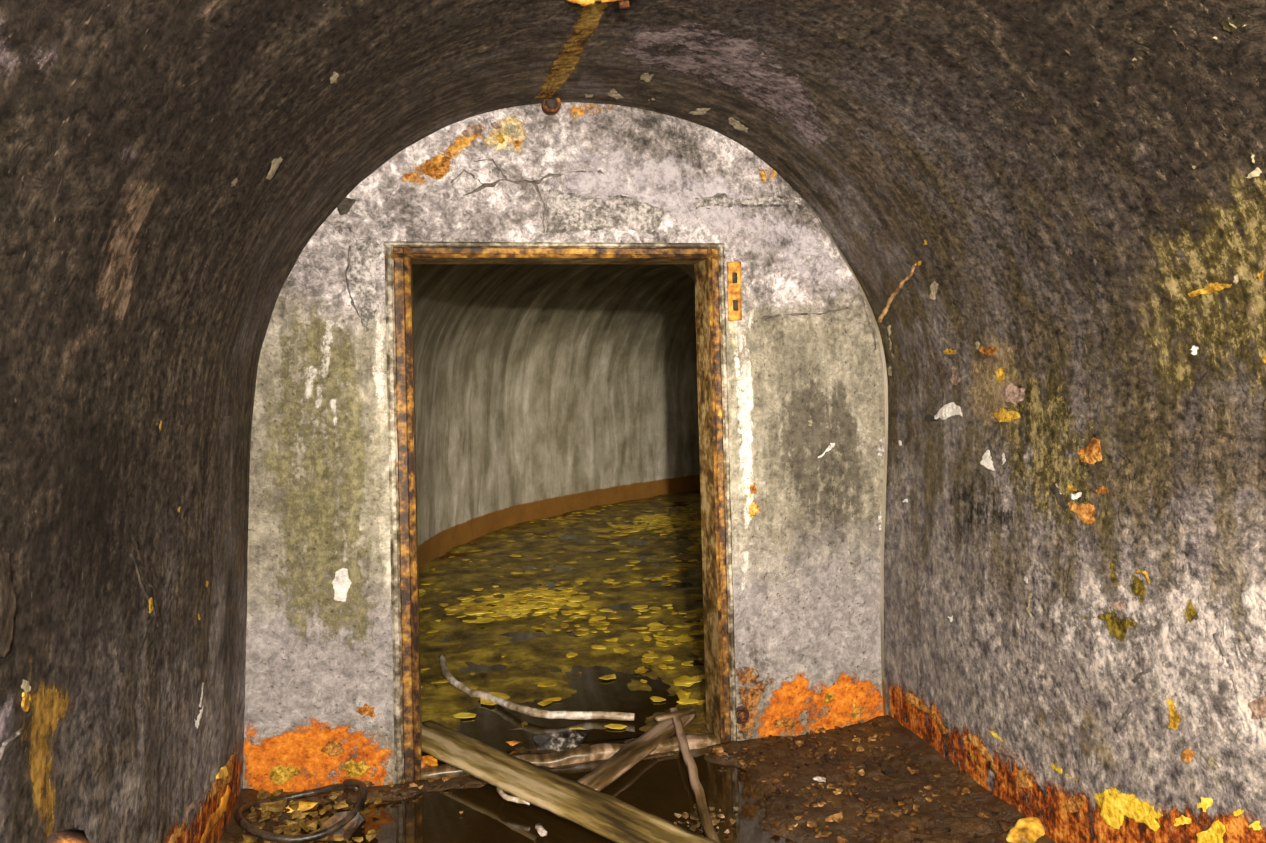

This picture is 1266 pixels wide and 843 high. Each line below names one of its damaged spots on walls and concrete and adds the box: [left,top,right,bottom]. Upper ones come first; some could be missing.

corrosion [535,1,610,99]
damp [266,308,386,652]
corrosion [735,667,776,739]